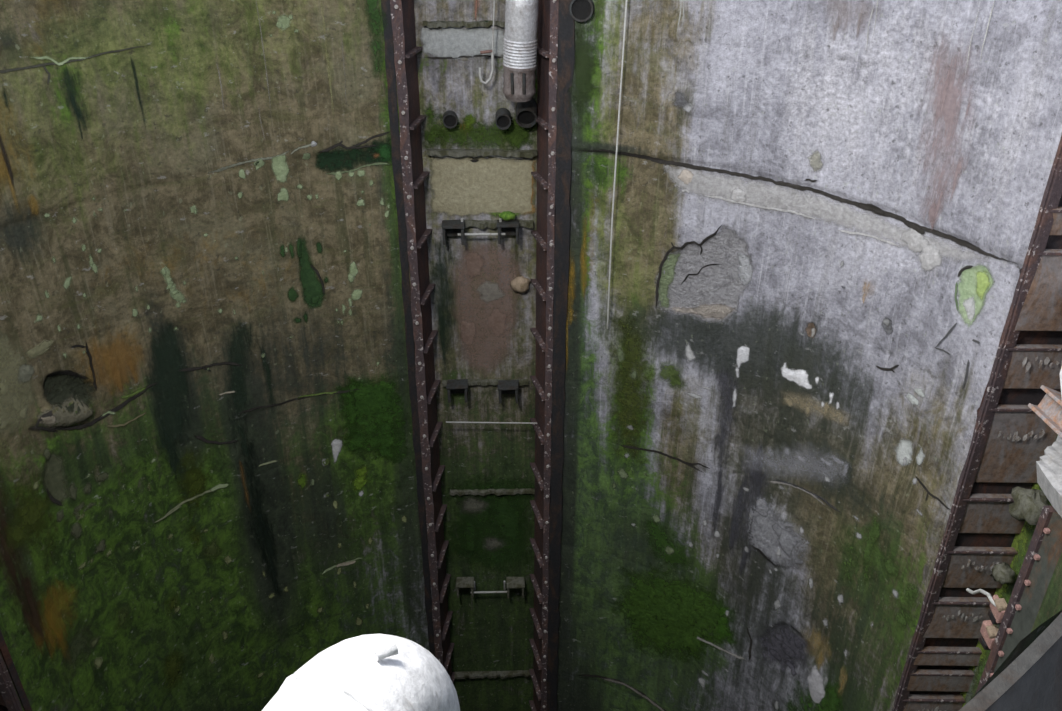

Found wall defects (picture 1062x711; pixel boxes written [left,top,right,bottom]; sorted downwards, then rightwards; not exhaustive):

spalling [44,343,97,414]
leakage [149,324,190,506]
leakage [230,323,280,594]
rust [566,232,586,368]
crack [655,225,722,307]
leakage [712,371,766,574]
crack [583,149,1014,263]
peeling [655,165,993,326]
spalling [882,318,893,334]
rust [975,506,1057,694]